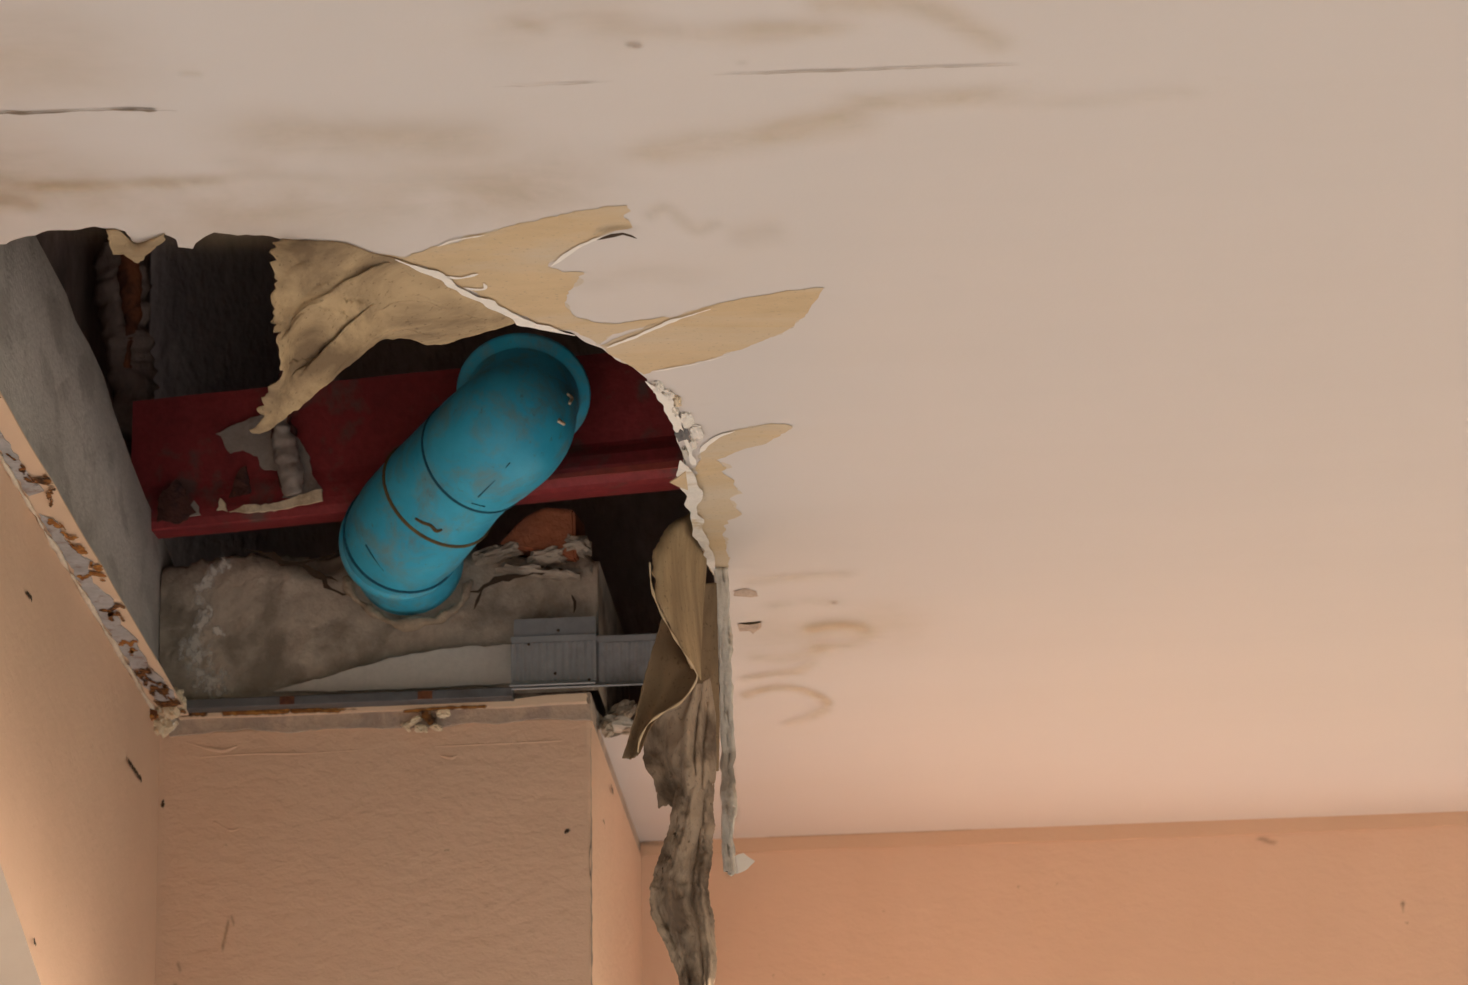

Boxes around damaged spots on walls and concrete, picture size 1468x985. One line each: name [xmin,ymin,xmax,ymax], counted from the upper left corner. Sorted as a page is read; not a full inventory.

peeling [375,205,824,575]
peeling [0,431,44,496]
peeling [215,415,278,471]
peeling [282,436,323,498]
peeling [190,498,228,517]
peeling [39,514,175,702]
peeling [733,589,758,597]
peeling [737,622,762,635]
spalling [598,699,637,738]
peeling [734,853,755,874]